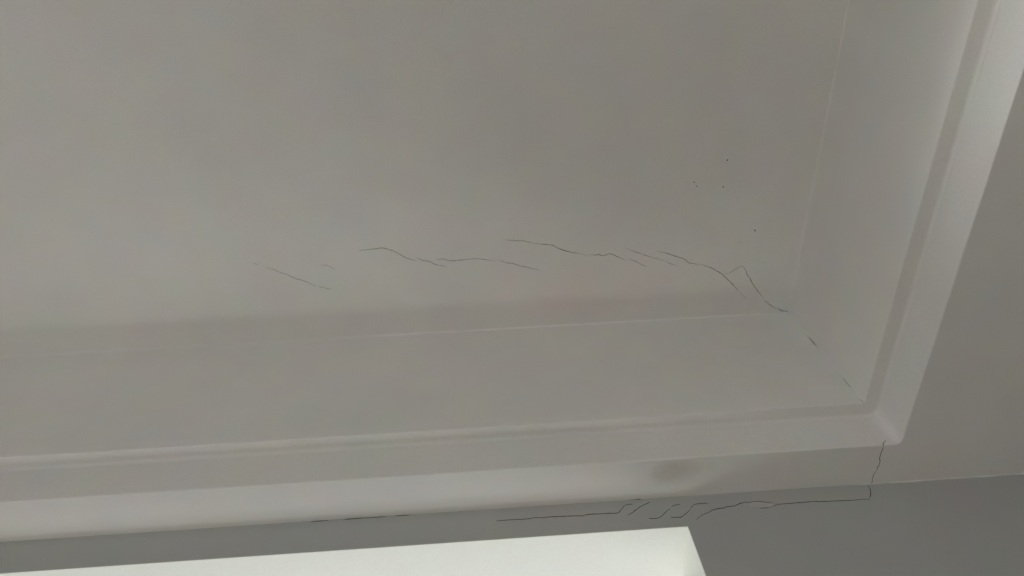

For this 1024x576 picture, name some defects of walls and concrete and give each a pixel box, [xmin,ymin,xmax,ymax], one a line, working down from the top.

crack [500,440,886,521]